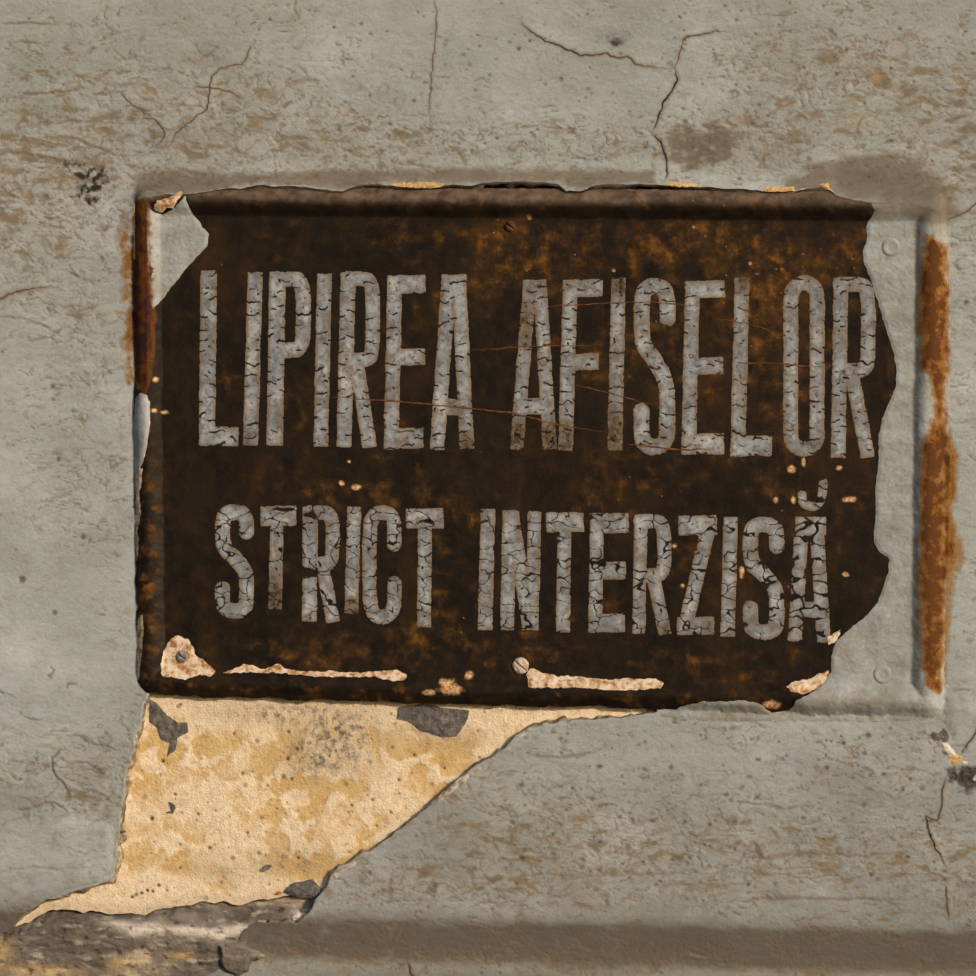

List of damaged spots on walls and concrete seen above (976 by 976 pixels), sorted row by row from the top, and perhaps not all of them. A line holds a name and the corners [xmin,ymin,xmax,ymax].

crack [524,26,725,179]
corrosion [120,200,156,394]
corrosion [917,235,964,694]
flaking render [0,196,976,976]
crack [925,783,949,917]